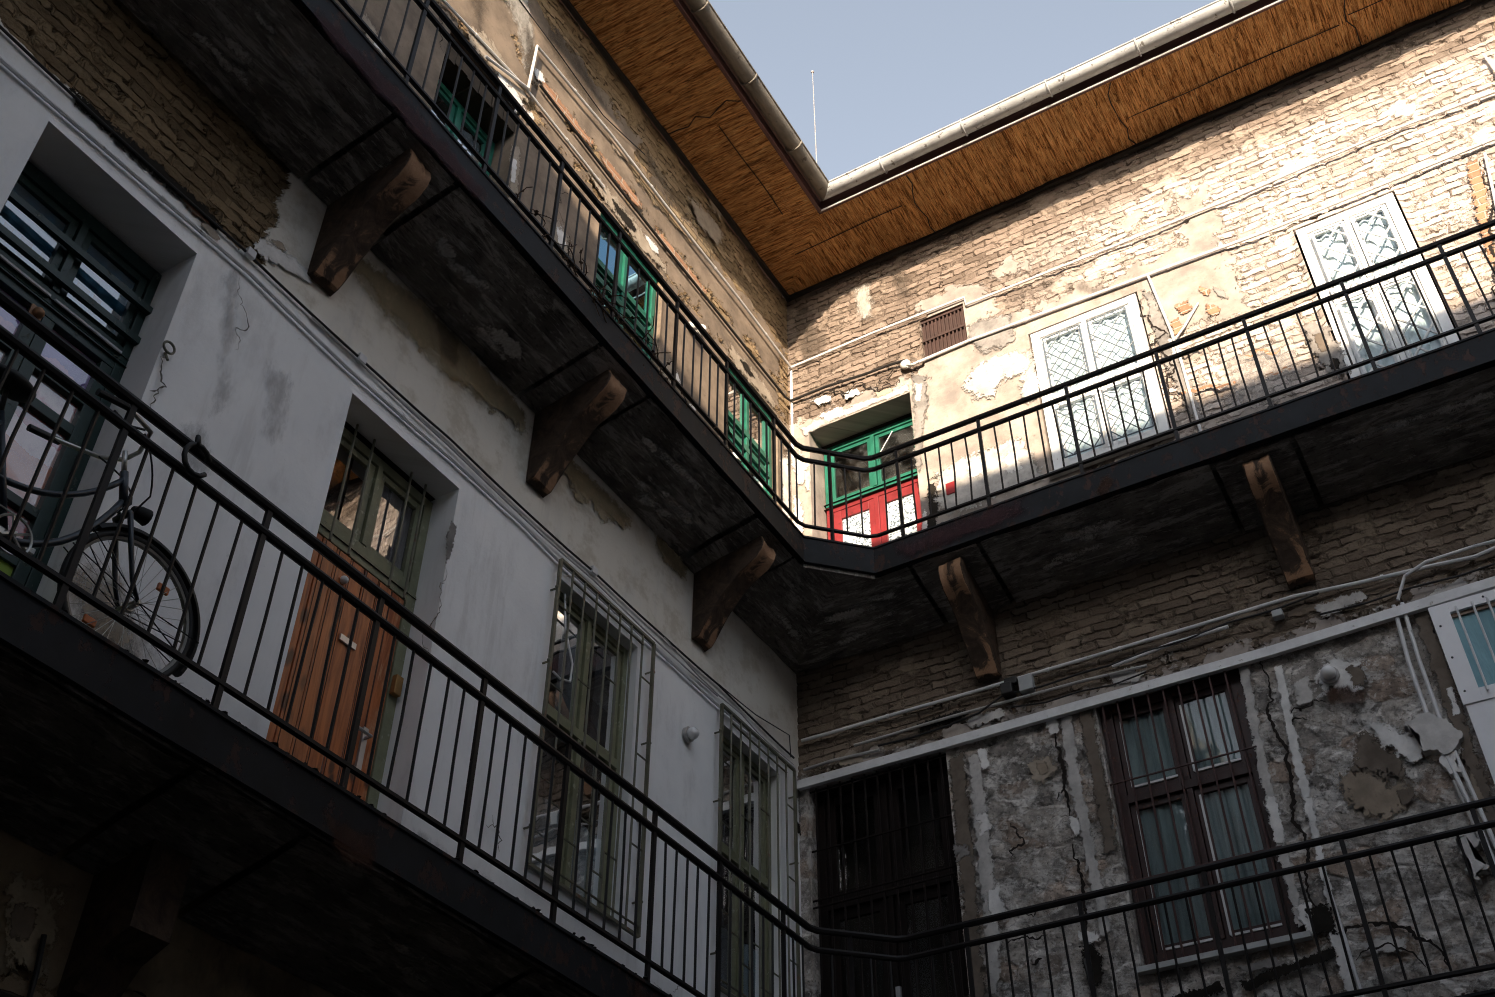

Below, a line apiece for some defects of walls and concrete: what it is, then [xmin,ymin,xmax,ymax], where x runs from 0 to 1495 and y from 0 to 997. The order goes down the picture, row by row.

flaking render [69,87,223,241]
spalling [248,238,313,284]
flaking render [1466,157,1495,296]
peeling [354,259,532,434]
peeling [1017,348,1043,404]
peeling [1292,676,1314,705]
peeling [1345,664,1367,689]
peeling [1446,687,1461,716]
peeling [1334,719,1464,822]
crack [1259,661,1448,997]
peeling [0,861,73,997]